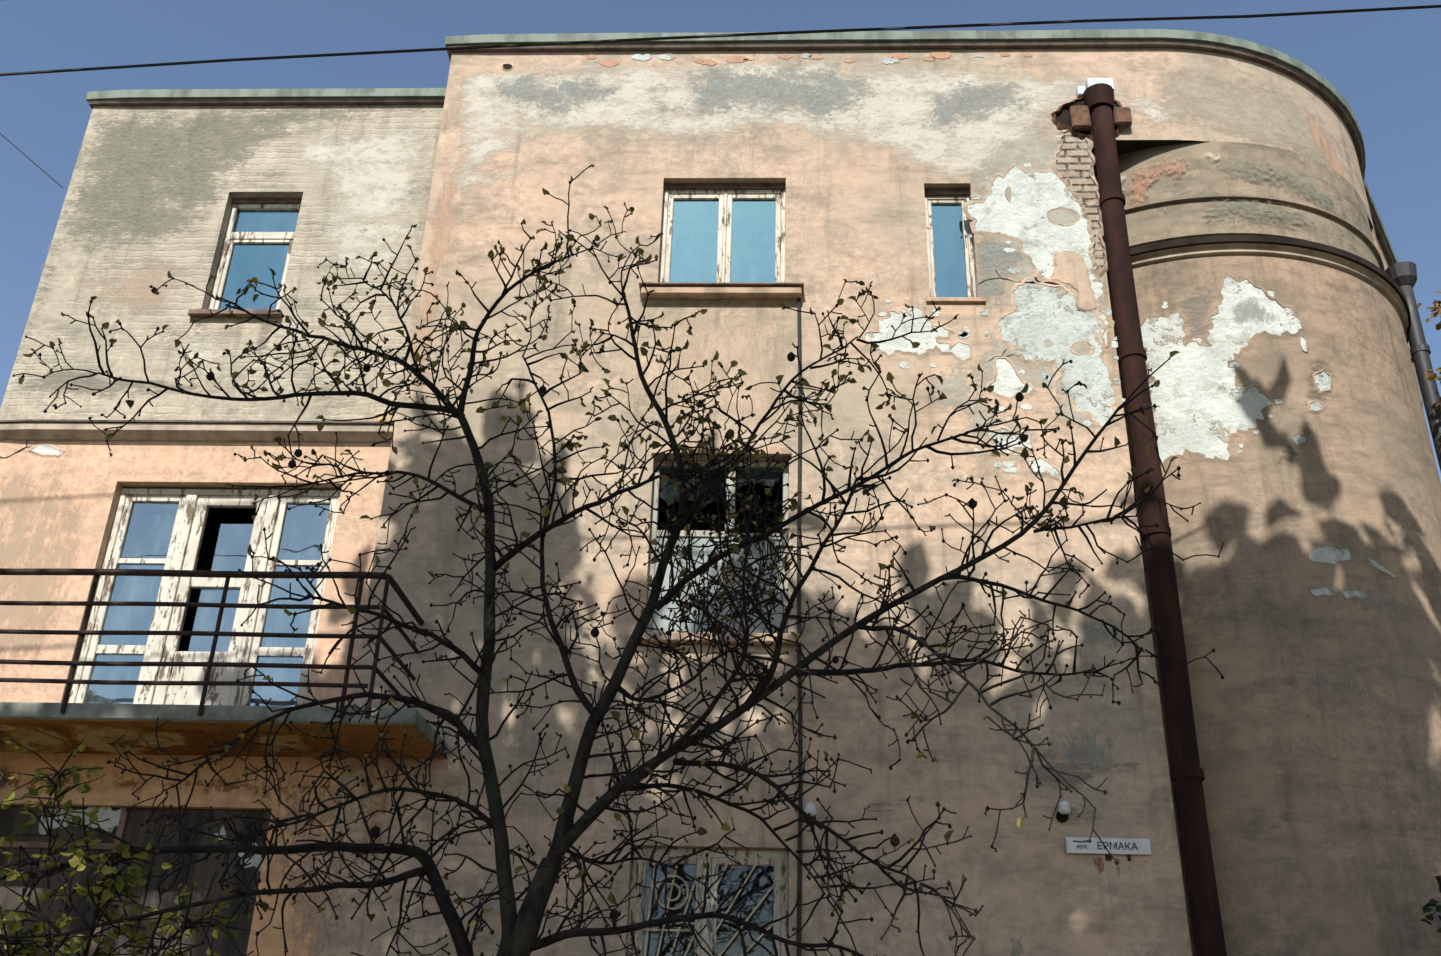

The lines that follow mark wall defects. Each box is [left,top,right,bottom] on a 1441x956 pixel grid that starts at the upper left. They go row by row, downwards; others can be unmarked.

leakage [64,105,430,276]
leakage [411,62,1078,383]
leakage [186,321,227,364]
leakage [257,323,301,354]
flaking render [861,99,1126,486]
leakage [930,334,1095,436]
flaking render [1140,273,1310,467]
flaking render [1306,368,1334,414]
flaking render [1307,585,1370,601]
flaking render [1305,542,1399,580]